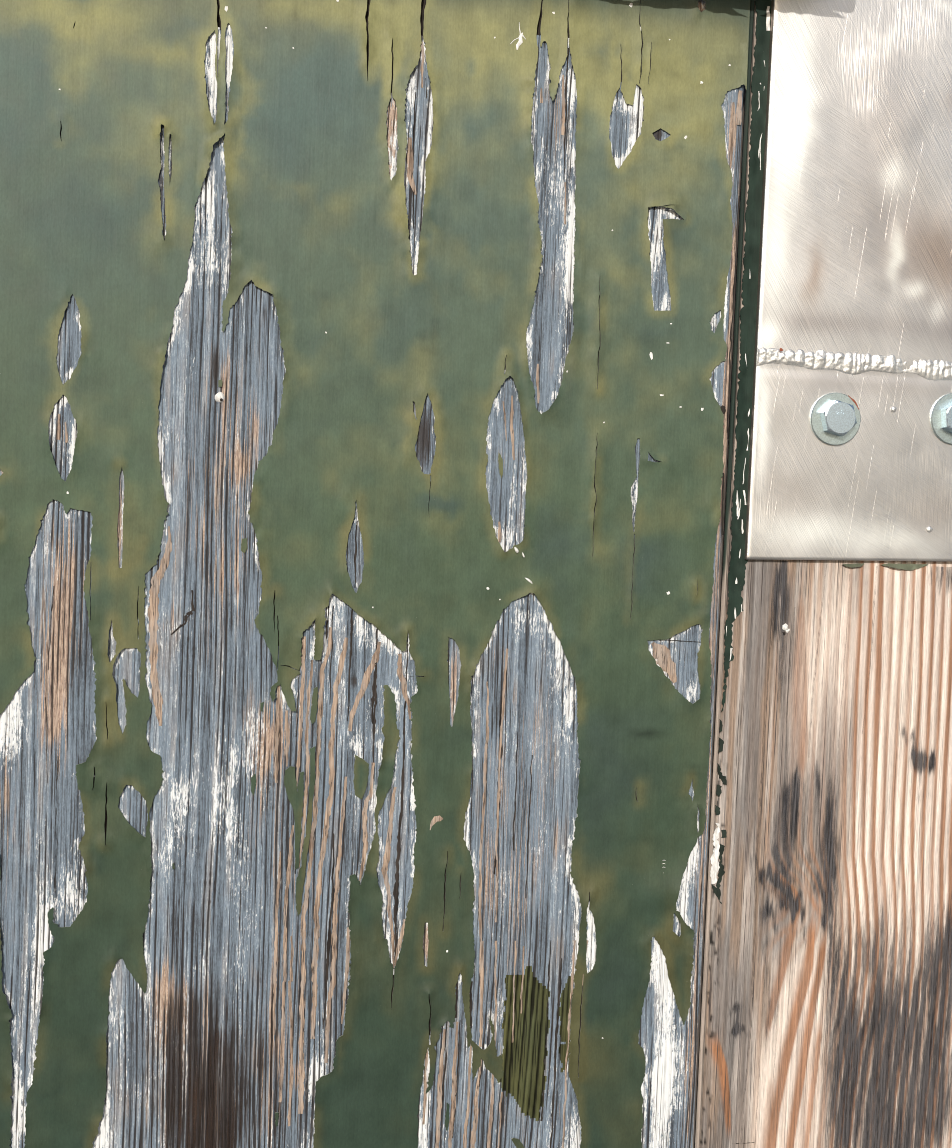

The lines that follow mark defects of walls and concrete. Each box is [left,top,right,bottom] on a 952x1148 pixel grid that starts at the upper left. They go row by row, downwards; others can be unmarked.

crack [215,0,223,30]
crack [365,0,393,93]
crack [419,0,427,36]
crack [536,0,569,38]
peeling [609,80,670,169]
peeling [526,35,577,414]
peeling [485,370,528,552]
peeling [0,6,443,1148]
peeling [638,0,774,1148]
leakage [903,728,936,774]
peeling [417,593,597,1148]
leakage [751,766,952,1148]